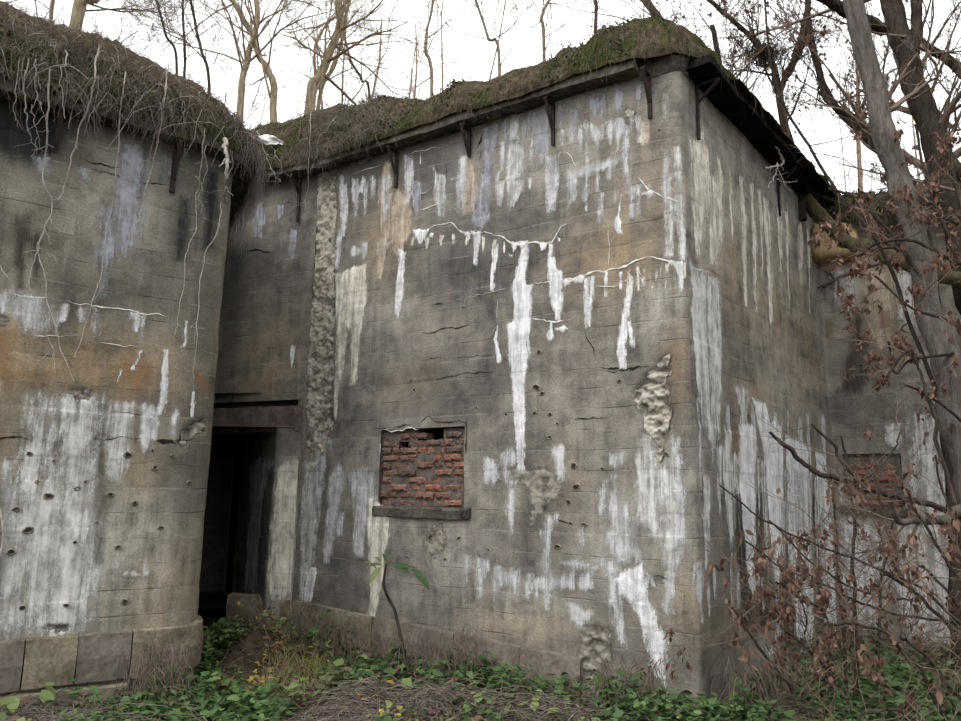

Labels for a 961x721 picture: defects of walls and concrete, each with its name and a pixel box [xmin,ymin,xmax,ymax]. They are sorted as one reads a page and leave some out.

crack [0,426,70,443]
crack [91,420,205,444]
spalling [305,168,338,469]
crack [410,355,492,382]
leakage [334,83,650,419]
leakage [483,243,532,531]
crack [534,235,710,297]
spalling [634,354,672,461]
leakage [655,131,951,658]
leakage [0,350,178,636]
spalling [497,461,581,526]
spalling [577,625,614,682]